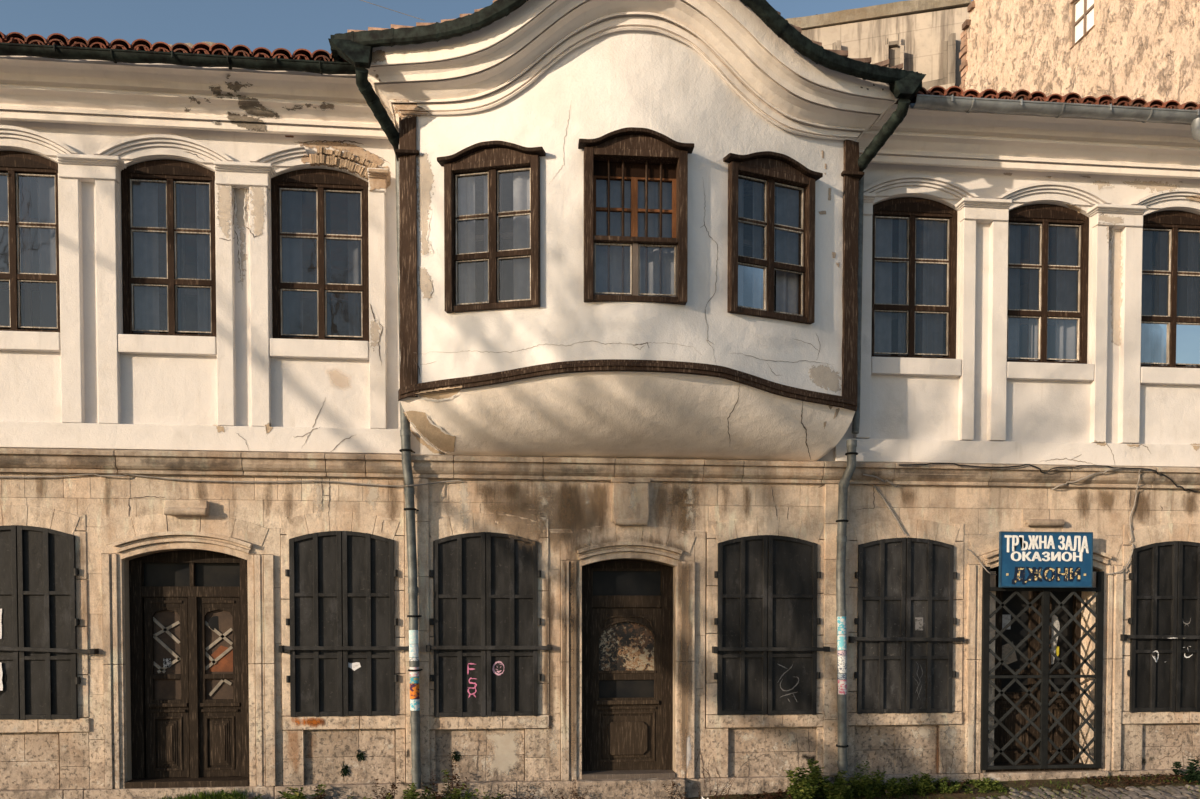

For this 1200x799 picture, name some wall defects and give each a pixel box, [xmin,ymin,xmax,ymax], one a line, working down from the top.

flaking render [184,75,335,132]
flaking render [285,135,391,191]
peeling [417,153,434,298]
crack [414,177,834,377]
crack [369,303,383,366]
crack [296,397,354,512]
peeling [404,385,462,454]
crack [801,401,811,459]
leakage [1134,493,1149,520]
leakage [1153,477,1196,513]
leakage [460,468,606,766]
leakage [677,547,692,770]